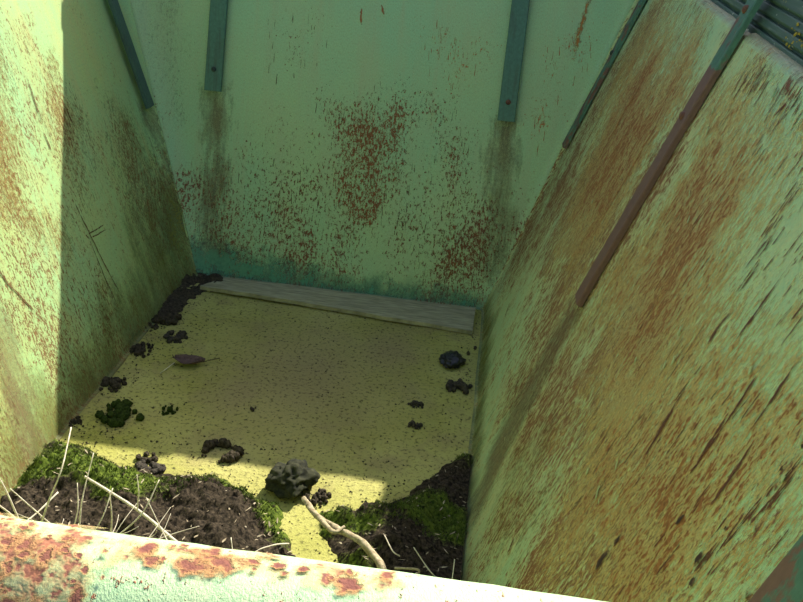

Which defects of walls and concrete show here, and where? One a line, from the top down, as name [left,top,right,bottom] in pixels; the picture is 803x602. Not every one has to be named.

rust [0,55,119,301]
rust [237,23,489,292]
rust [531,3,597,154]
rust [467,41,803,602]
rust [0,513,403,602]